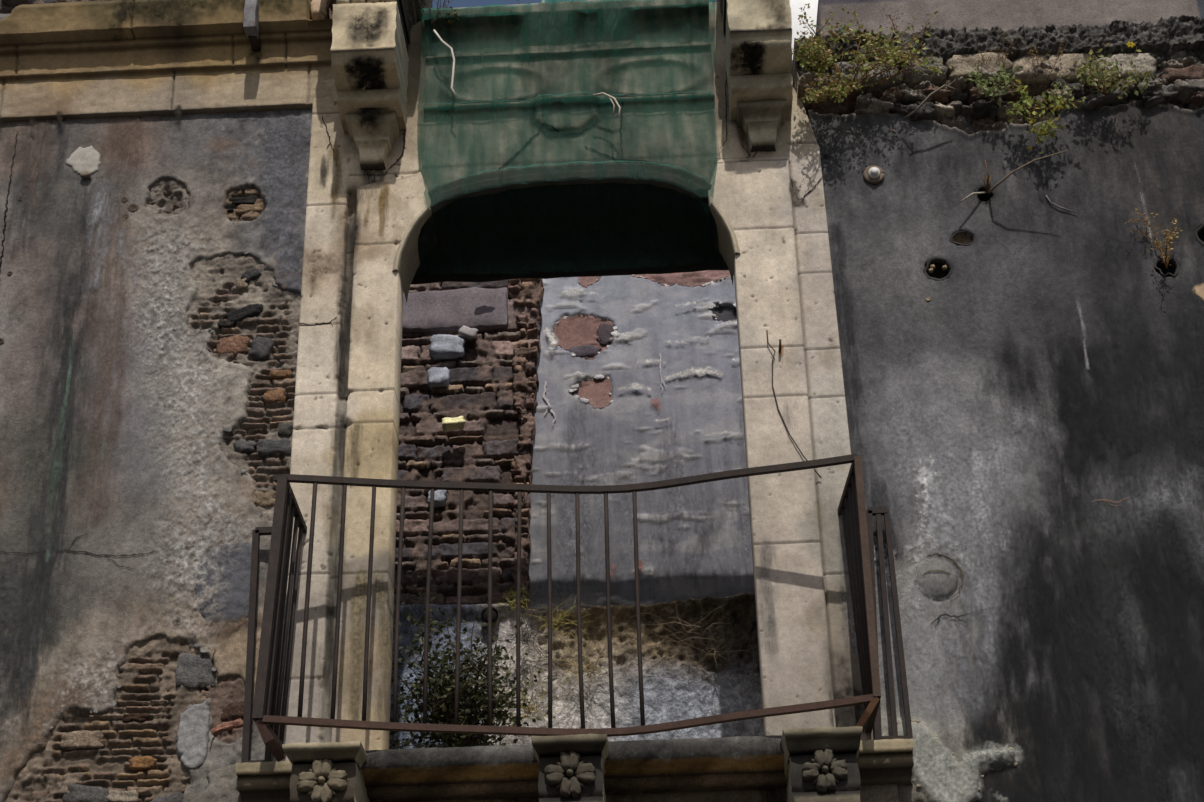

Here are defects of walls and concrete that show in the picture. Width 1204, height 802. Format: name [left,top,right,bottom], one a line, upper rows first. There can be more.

damp [345,56,386,90]
crack [0,132,18,271]
spalling [186,252,301,521]
damp [336,288,352,395]
spalling [507,276,651,609]
flaking render [638,358,722,380]
flaking render [631,270,737,343]
damp [831,225,866,428]
damp [860,138,1204,802]
crack [0,530,253,568]
damp [324,542,340,691]
spalling [5,636,254,802]